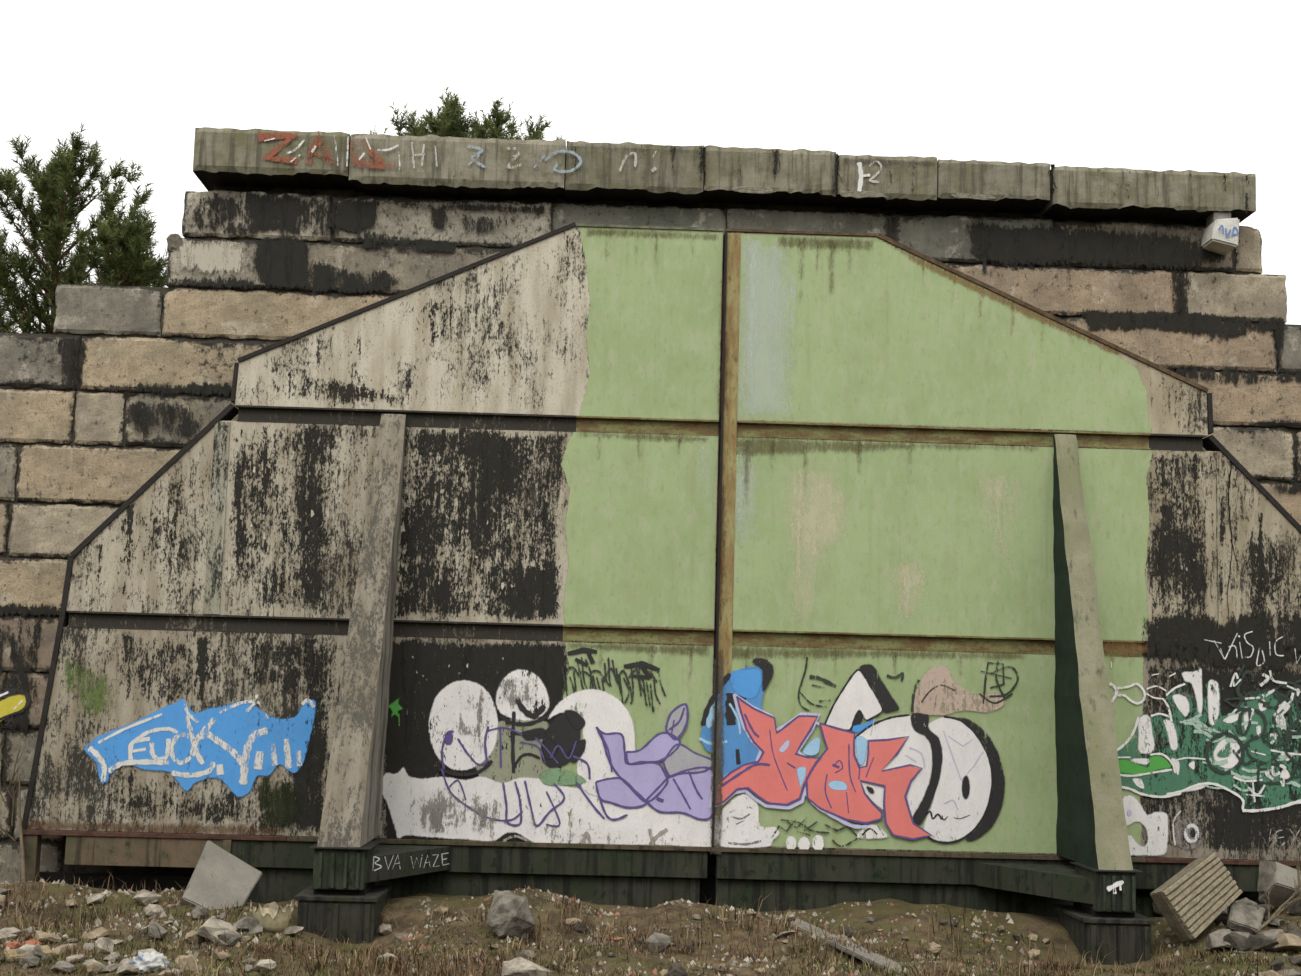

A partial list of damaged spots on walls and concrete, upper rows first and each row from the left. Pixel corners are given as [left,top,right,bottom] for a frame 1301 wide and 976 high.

damp [966,220,1301,427]
damp [90,473,205,605]
damp [1274,442,1301,495]
damp [66,635,339,835]